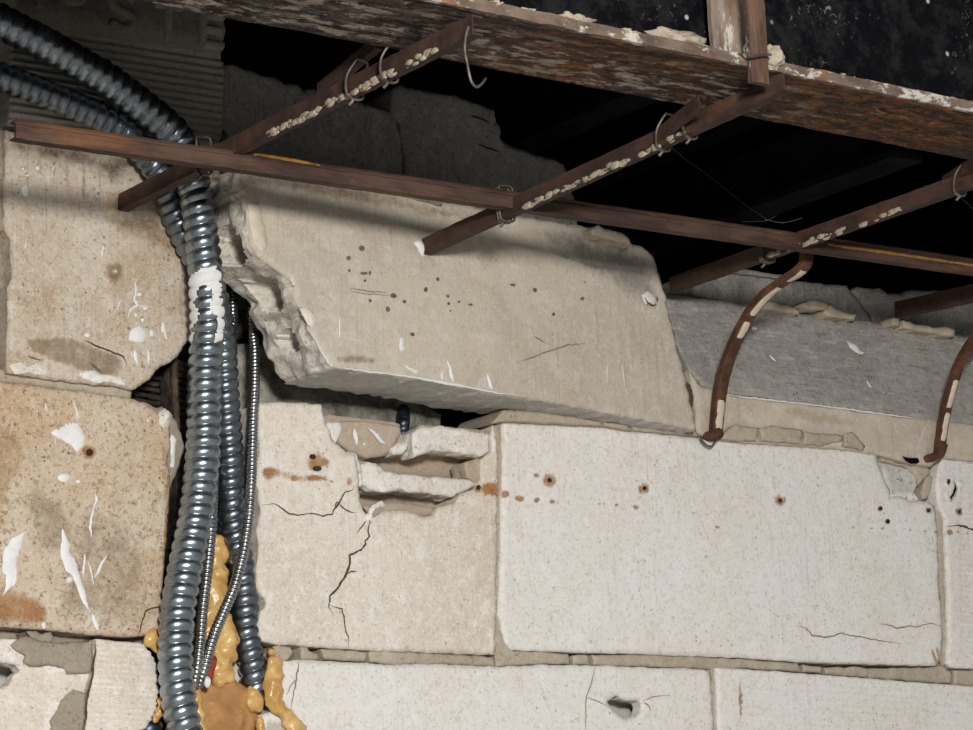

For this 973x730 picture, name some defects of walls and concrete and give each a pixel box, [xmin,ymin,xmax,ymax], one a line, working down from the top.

corrosion [254,152,320,166]
corrosion [828,244,973,267]
spalling [324,415,489,521]
crack [264,486,371,646]
crack [801,623,941,644]
spalling [0,647,21,668]
crack [585,669,605,730]